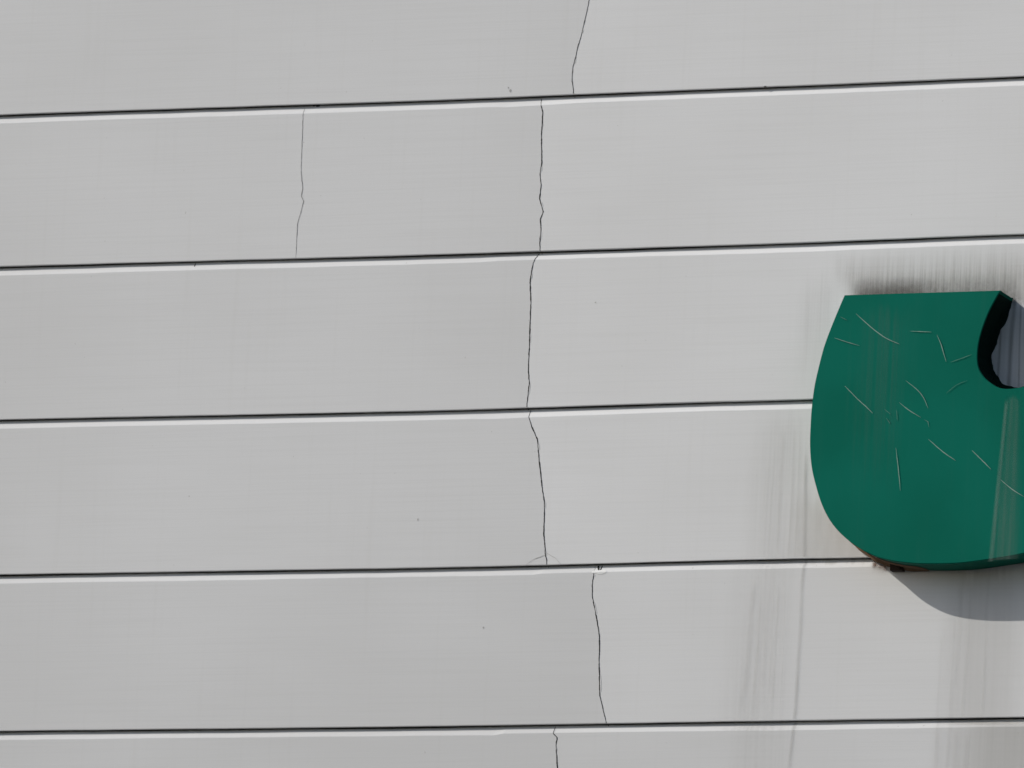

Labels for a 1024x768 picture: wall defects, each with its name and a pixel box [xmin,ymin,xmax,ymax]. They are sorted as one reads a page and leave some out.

crack [572,1,589,93]
crack [296,109,305,246]
crack [526,99,559,568]
crack [592,574,609,726]